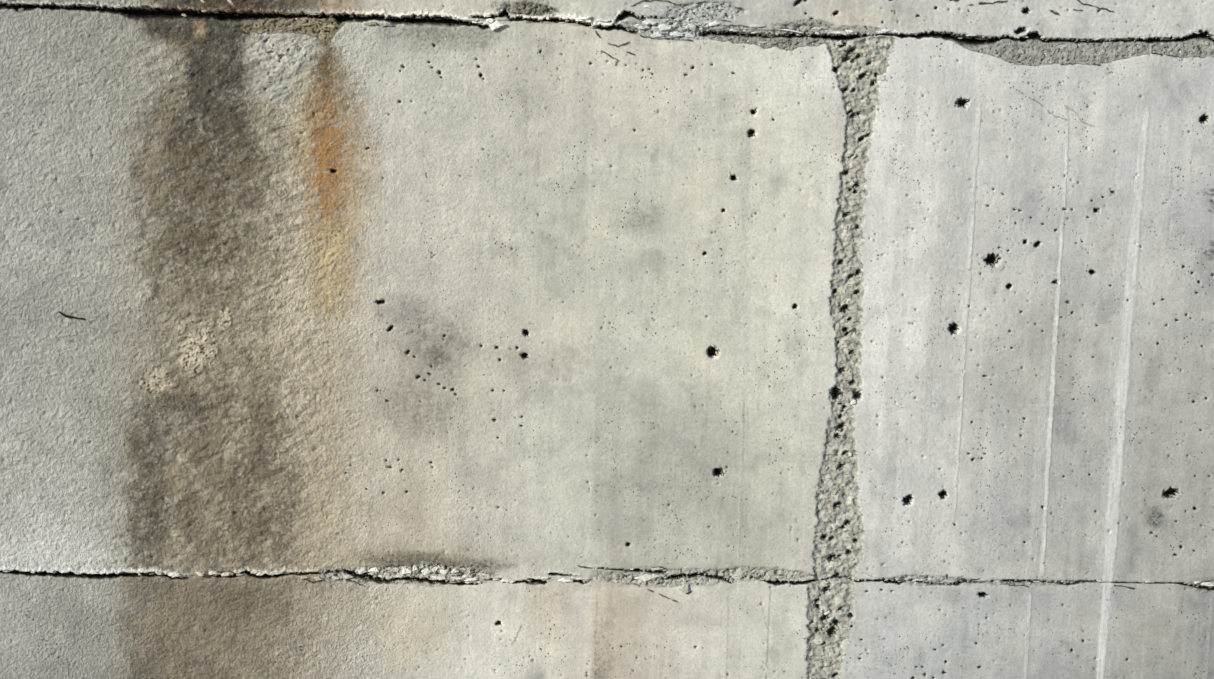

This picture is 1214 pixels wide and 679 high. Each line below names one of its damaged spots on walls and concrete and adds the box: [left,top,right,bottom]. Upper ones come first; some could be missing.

leakage [130,0,294,319]
corrosion [302,39,357,309]
crack [0,0,1214,66]
spalling [597,0,970,679]
leakage [122,348,317,679]
crack [0,564,1214,602]